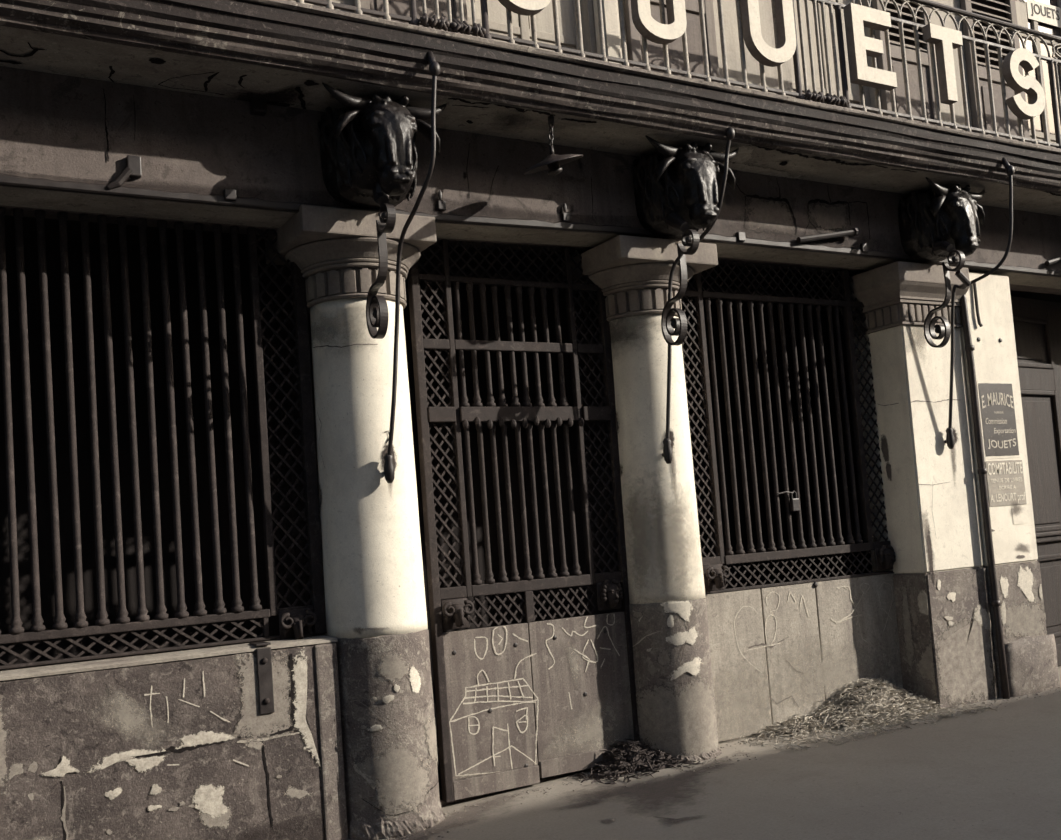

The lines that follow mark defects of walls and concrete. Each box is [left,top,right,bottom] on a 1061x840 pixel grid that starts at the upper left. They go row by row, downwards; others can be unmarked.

crack [0,42,46,64]
crack [103,66,136,162]
crack [158,72,247,95]
spalling [901,544,1046,707]
spalling [0,703,80,794]
spalling [105,788,122,800]
crack [60,730,300,840]
spalling [148,784,231,829]
peeling [231,647,320,766]
spalling [277,775,315,799]
spalling [371,654,421,703]
spalling [636,598,718,758]